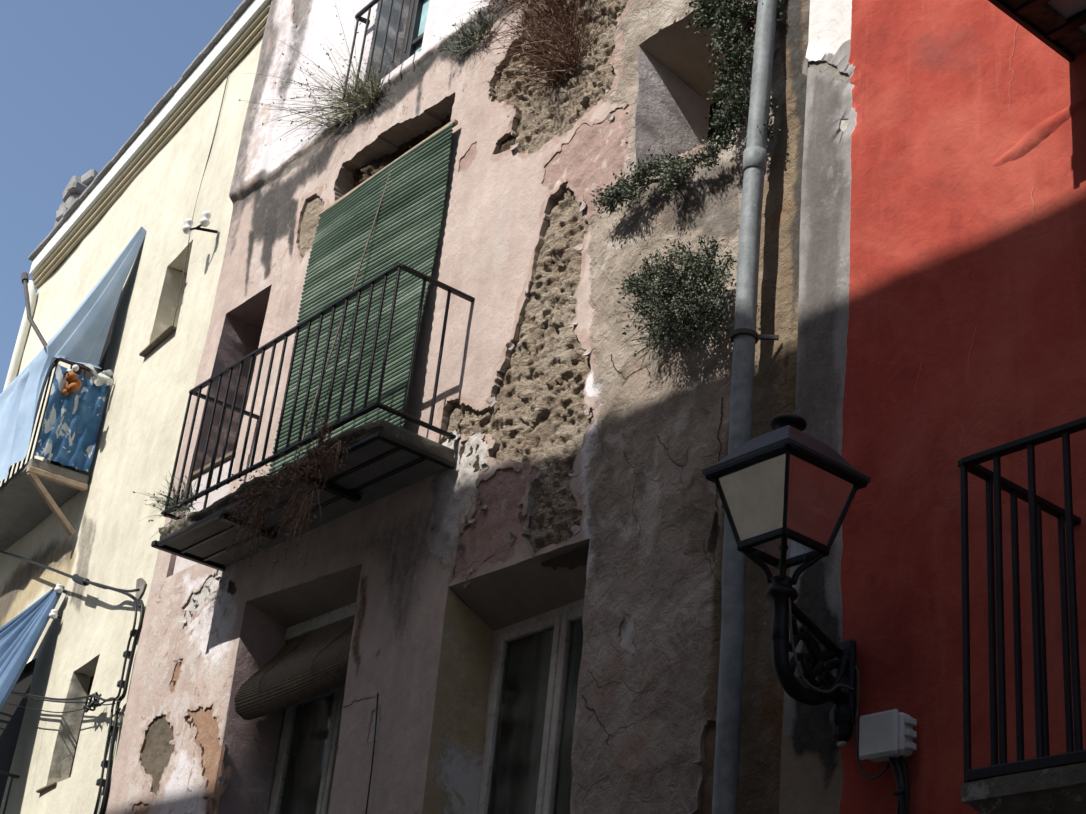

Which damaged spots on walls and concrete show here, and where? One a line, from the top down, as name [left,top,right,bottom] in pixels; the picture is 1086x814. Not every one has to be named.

flaking render [293,0,310,27]
flaking render [802,56,851,83]
damp [245,25,475,284]
damp [785,0,843,447]
flaking render [430,0,629,588]
crack [716,397,724,462]
flaking render [179,570,236,626]
damp [796,551,840,689]
flaking render [133,715,175,814]
flaking render [184,706,231,814]
crack [581,666,663,746]
damp [792,700,838,781]